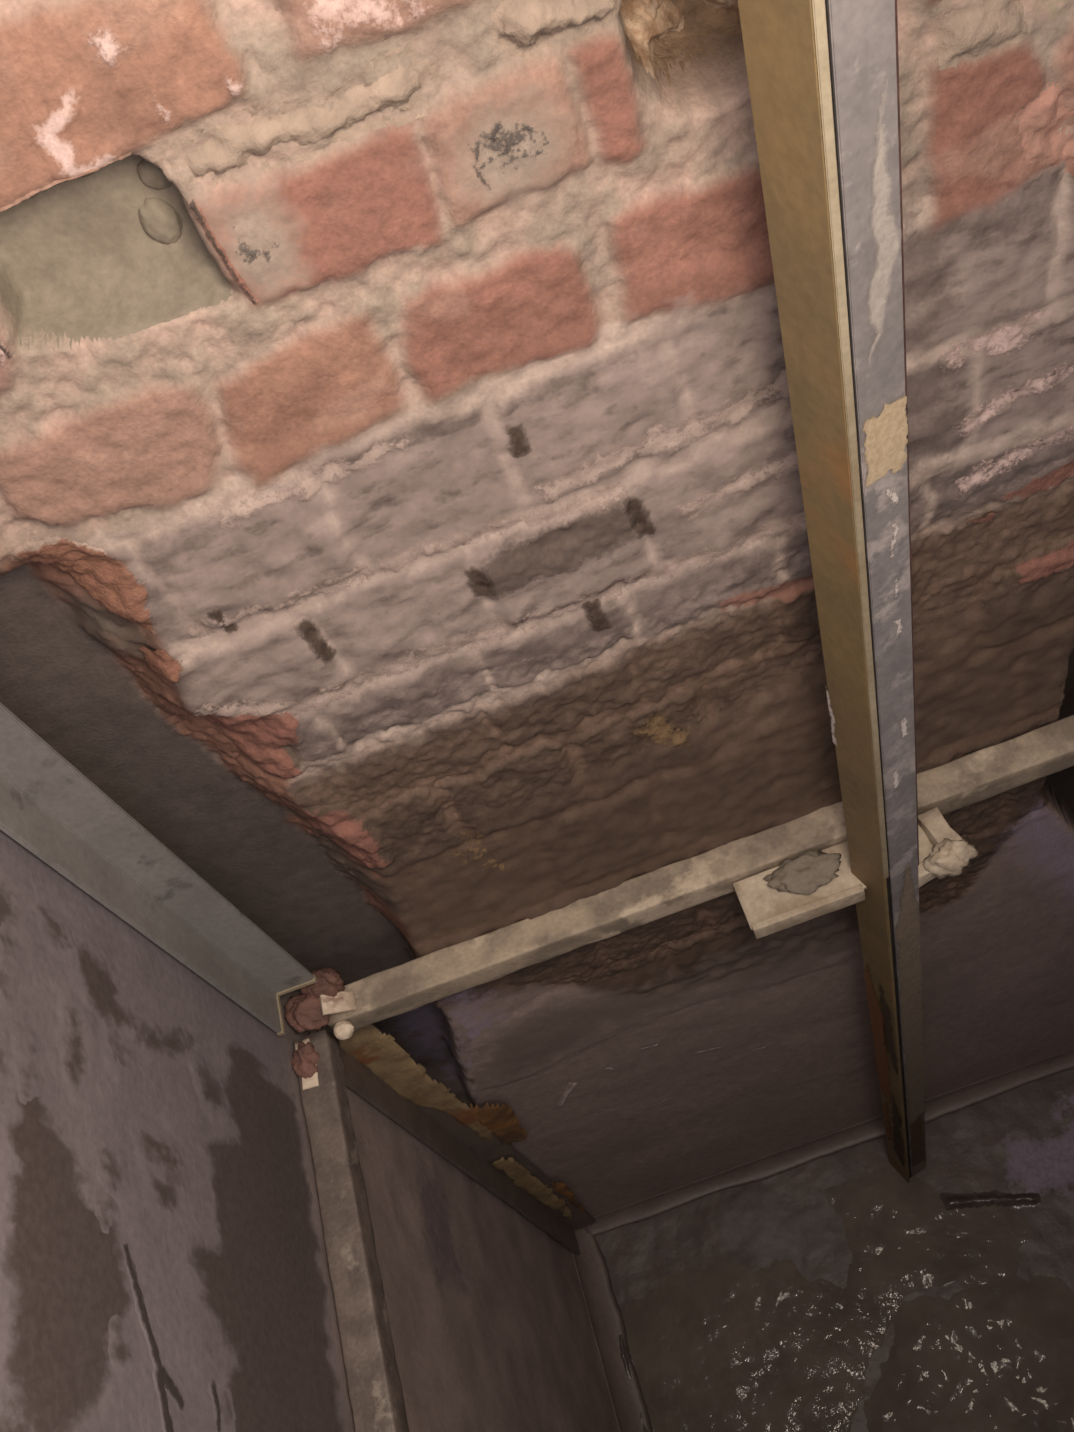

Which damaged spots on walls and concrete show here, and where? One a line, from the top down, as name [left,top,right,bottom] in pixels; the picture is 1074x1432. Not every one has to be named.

damp [21,82,121,181]
damp [90,30,119,65]
damp [227,79,244,95]
damp [274,0,429,52]
spalling [619,0,742,90]
spalling [0,155,236,351]
spalling [10,536,183,683]
spalling [202,710,307,779]
spalling [283,797,395,871]
damp [0,866,349,1432]
corrosion [339,1024,572,1220]
crack [122,1243,221,1432]